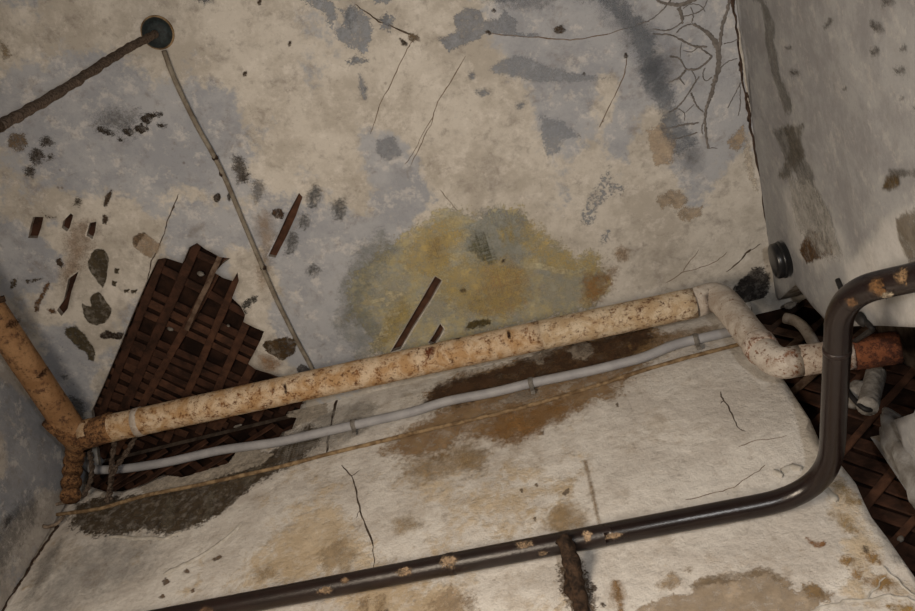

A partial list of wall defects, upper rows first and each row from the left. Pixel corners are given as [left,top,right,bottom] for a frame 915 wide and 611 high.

crack [666,0,768,283]
spalling [102,190,112,225]
damp [896,213,915,262]
spalling [56,224,137,340]
damp [346,204,613,354]
spalling [64,326,95,361]
spalling [261,337,297,369]
crack [720,392,784,447]
damp [66,403,328,537]
crack [326,400,375,567]
crack [685,465,765,500]
damp [637,567,834,611]